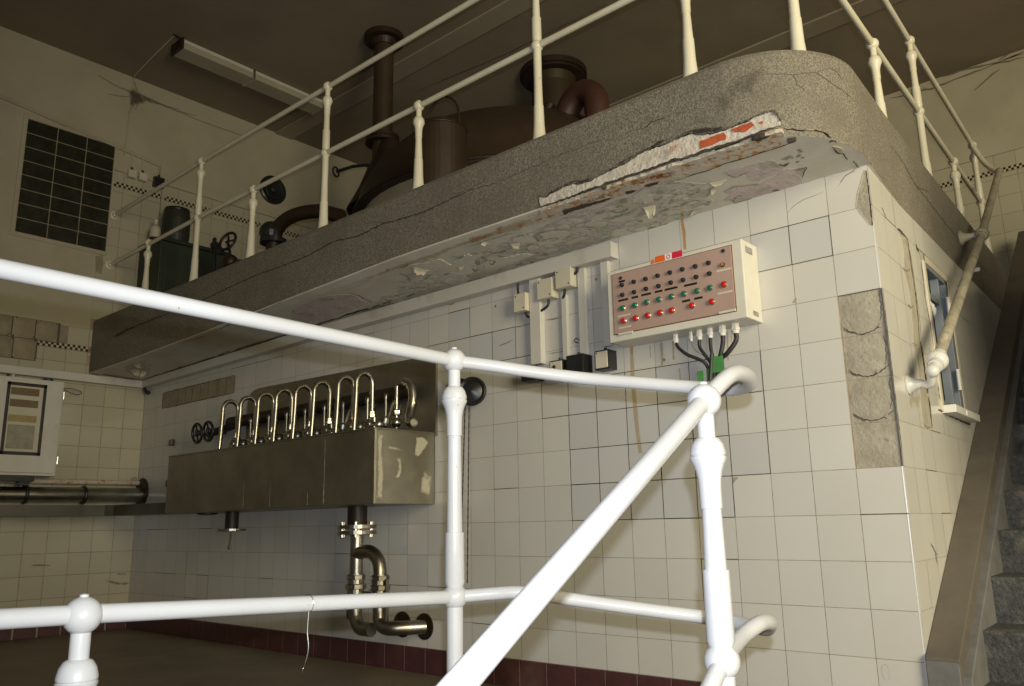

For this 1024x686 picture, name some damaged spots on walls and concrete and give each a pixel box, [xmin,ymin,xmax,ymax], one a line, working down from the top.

crack [767,68,854,100]
crack [201,111,687,301]
peeling [291,149,807,325]
corrosion [463,128,796,248]
spalling [538,109,781,208]